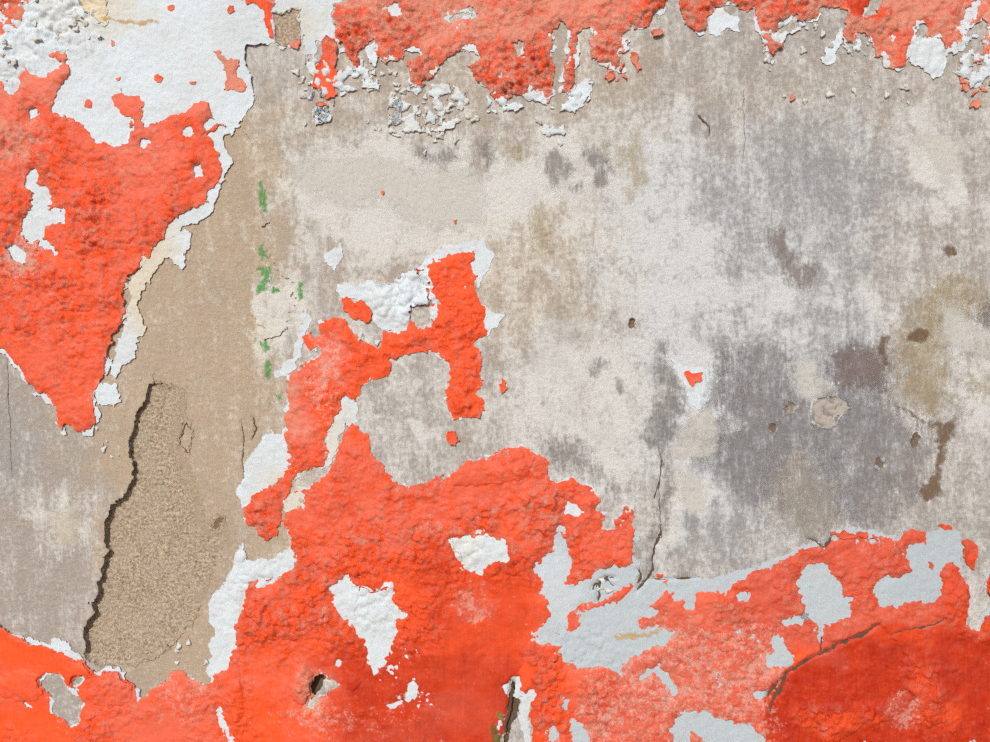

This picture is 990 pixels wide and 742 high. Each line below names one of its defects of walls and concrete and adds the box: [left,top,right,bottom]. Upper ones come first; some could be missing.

leakage [768,229,816,288]
leakage [908,328,929,342]
leakage [834,344,883,387]
peeling [448,529,510,576]
peeling [328,574,419,681]
peeling [736,562,853,668]
crack [767,619,944,712]
peeling [306,672,340,709]
peeling [386,678,433,714]
peeling [216,706,234,742]
peeling [545,697,590,742]
peeling [669,710,766,742]